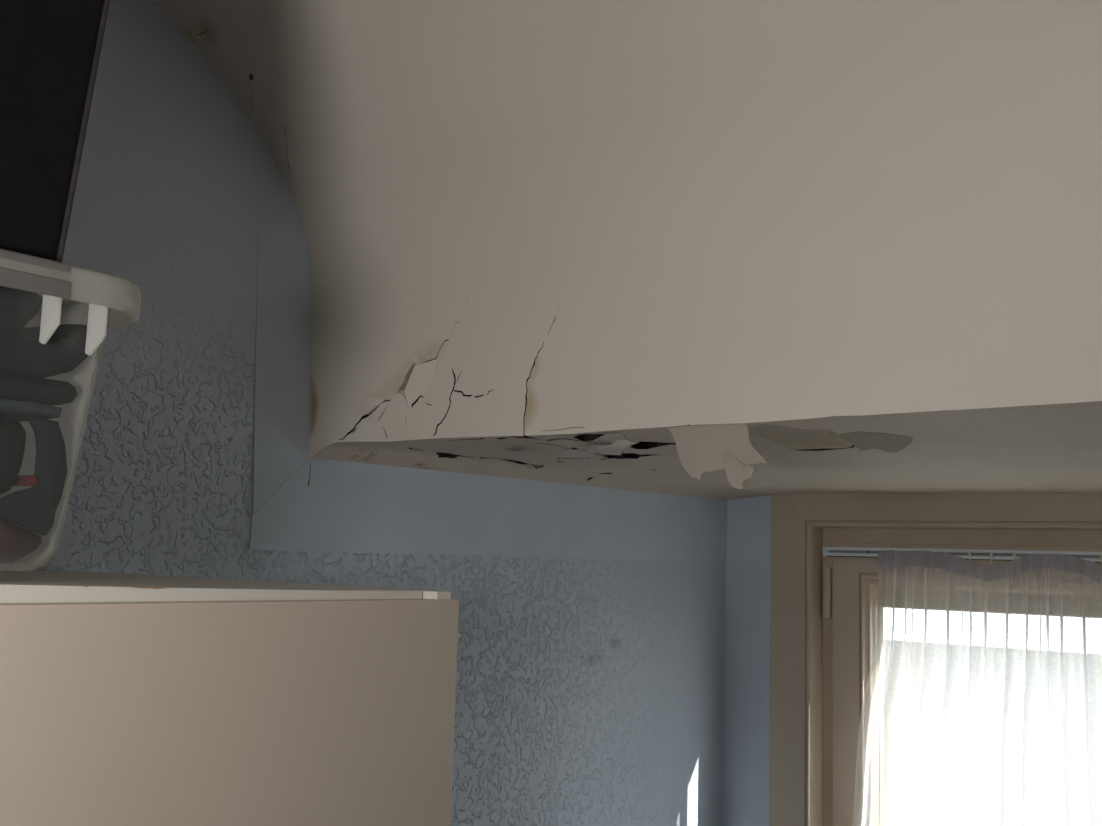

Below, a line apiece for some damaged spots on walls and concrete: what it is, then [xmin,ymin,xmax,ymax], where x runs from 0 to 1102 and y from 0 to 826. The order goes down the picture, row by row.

crack [339,299,494,440]
crack [523,316,584,437]
peeling [436,452,560,469]
peeling [497,424,913,489]